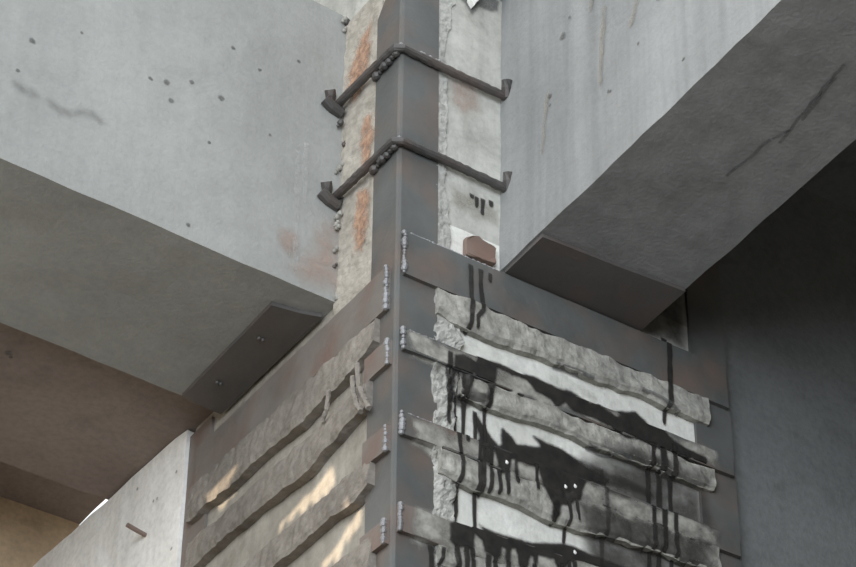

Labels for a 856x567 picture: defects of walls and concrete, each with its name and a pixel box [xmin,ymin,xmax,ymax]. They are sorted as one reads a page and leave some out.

spalling [463,0,498,12]
rust [348,29,370,98]
spalling [332,0,383,316]
crack [726,65,844,176]